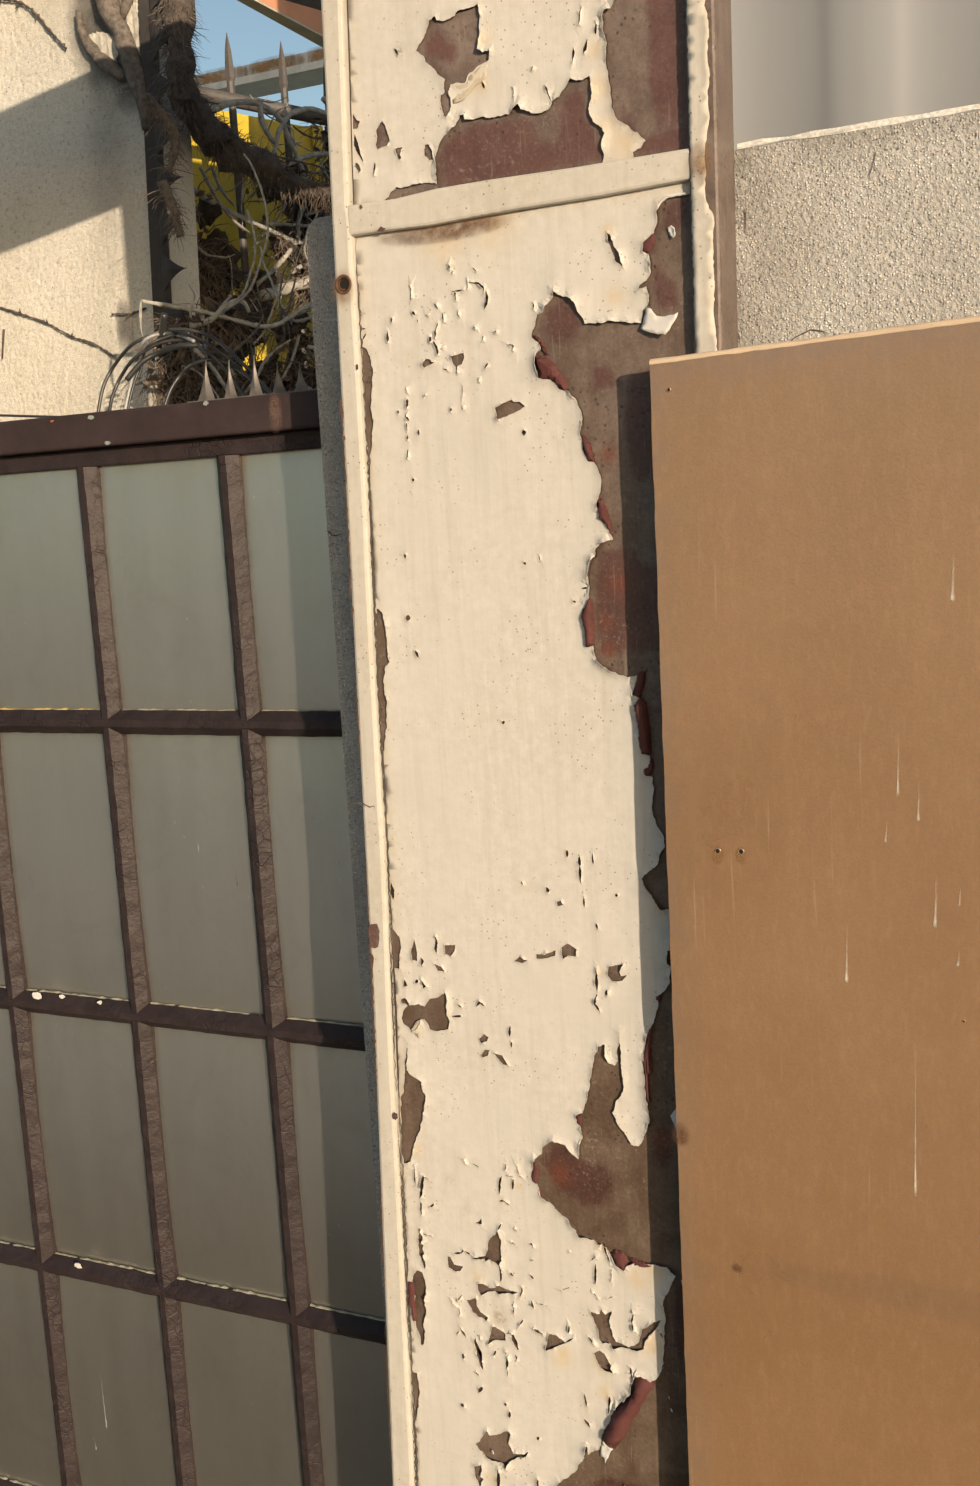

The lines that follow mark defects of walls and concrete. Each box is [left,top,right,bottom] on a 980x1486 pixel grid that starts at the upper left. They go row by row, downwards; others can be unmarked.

peeling [387,6,604,200]
peeling [604,0,689,157]
peeling [453,353,464,367]
peeling [496,400,525,419]
peeling [532,192,694,908]
peeling [392,1059,426,1162]
peeling [402,993,461,1038]
peeling [480,1027,512,1064]
peeling [408,1177,426,1344]
peeling [457,1224,534,1367]
peeling [531,951,689,1486]
peeling [477,1431,528,1465]